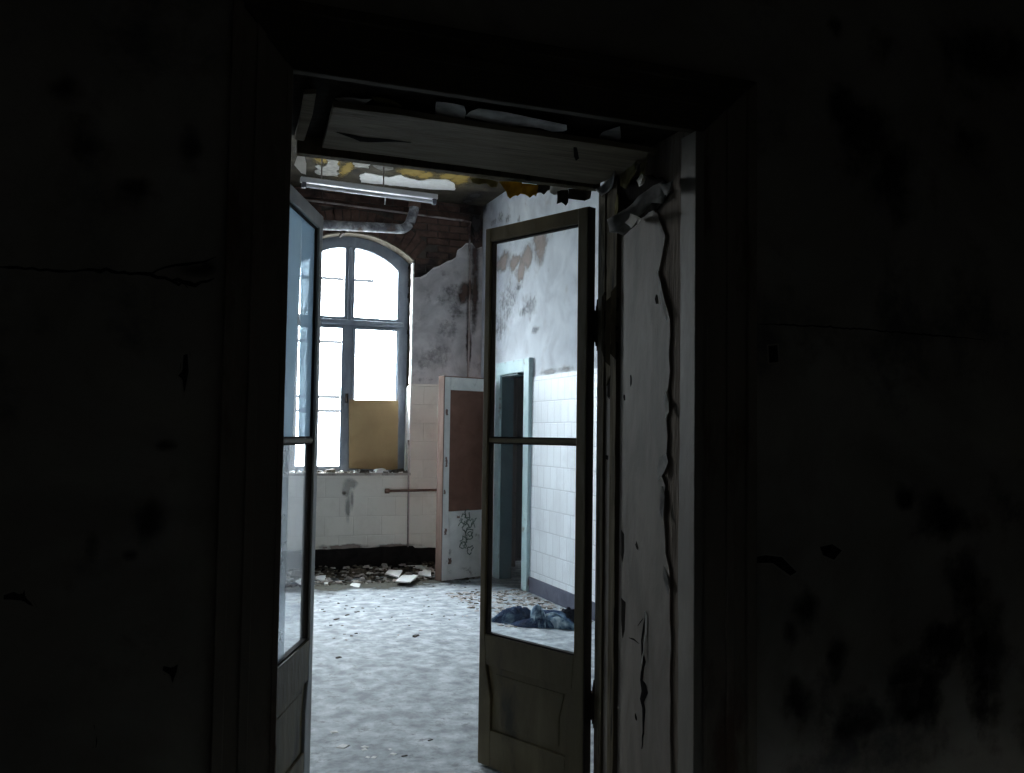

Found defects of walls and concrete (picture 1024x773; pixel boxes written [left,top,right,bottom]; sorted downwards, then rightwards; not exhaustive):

peeling [435,101,567,132]
peeling [470,156,673,235]
spalling [294,156,482,386]
leakage [497,234,547,289]
crack [630,611,648,749]